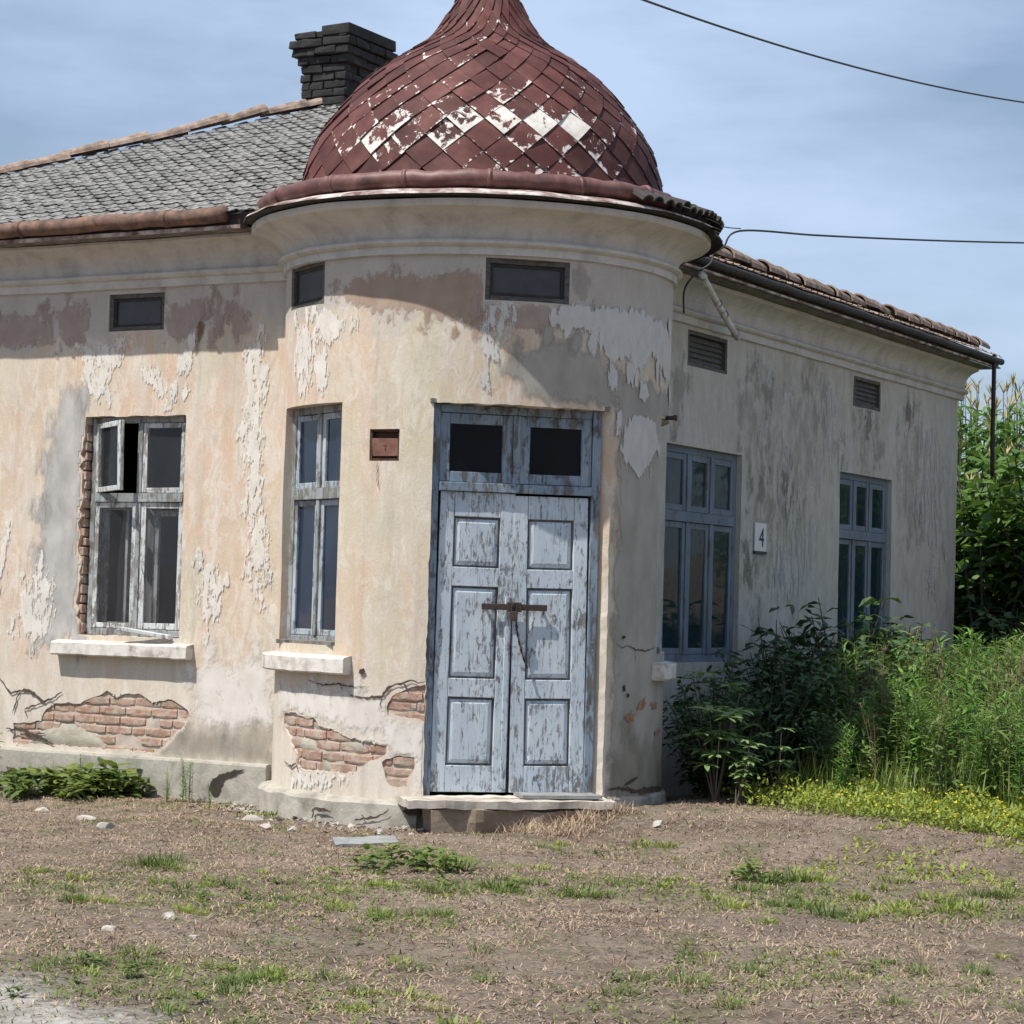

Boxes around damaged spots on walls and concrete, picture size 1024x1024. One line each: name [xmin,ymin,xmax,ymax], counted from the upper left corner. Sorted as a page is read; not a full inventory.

crack [0,679,62,744]
flaking render [0,292,128,657]
flaking render [13,691,190,753]
peeling [141,284,273,647]
crack [309,680,425,707]
peeling [282,263,671,796]